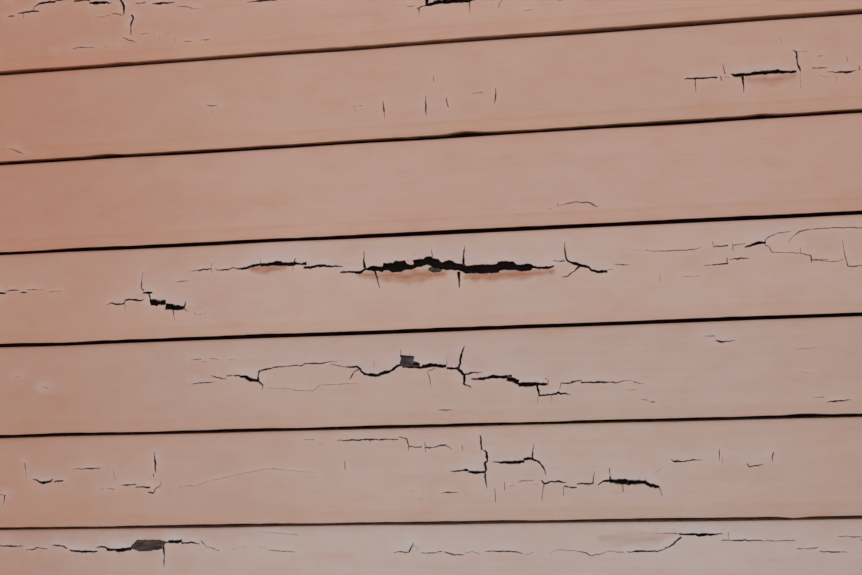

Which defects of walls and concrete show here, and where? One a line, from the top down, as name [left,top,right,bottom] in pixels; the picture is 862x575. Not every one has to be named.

crack [8,0,208,51]
peeling [408,0,473,17]
crack [685,42,860,93]
crack [106,242,747,320]
crack [194,358,263,389]
crack [345,346,655,403]
crack [24,452,316,494]
crack [305,435,723,502]
peeling [0,539,203,564]
crack [394,542,591,556]
crack [721,536,862,553]